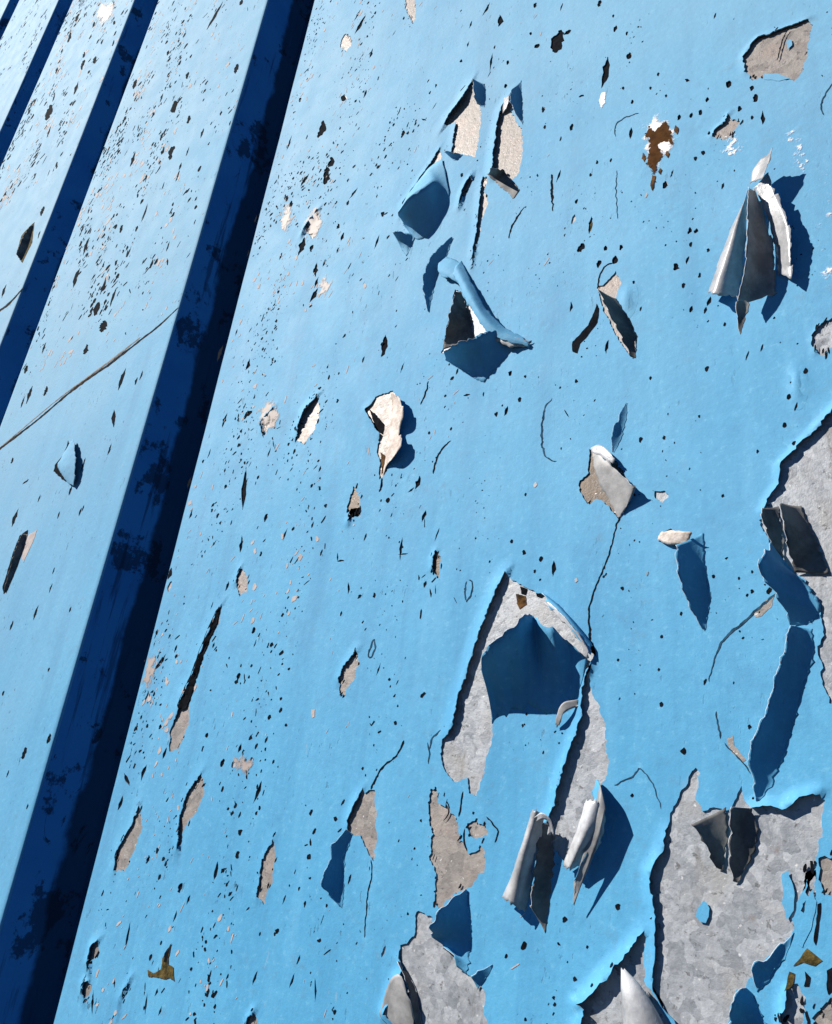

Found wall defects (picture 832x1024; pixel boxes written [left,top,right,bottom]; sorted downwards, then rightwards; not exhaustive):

peeling [393,78,486,256]
peeling [486,81,523,199]
rust [642,114,678,190]
crack [0,309,176,449]
peeling [365,391,404,489]
peeling [422,237,532,383]
peeling [572,246,638,359]
peeling [689,147,793,334]
crack [588,517,620,656]
peeling [577,403,832,1024]
peeling [379,573,609,1024]
rust [147,944,174,981]